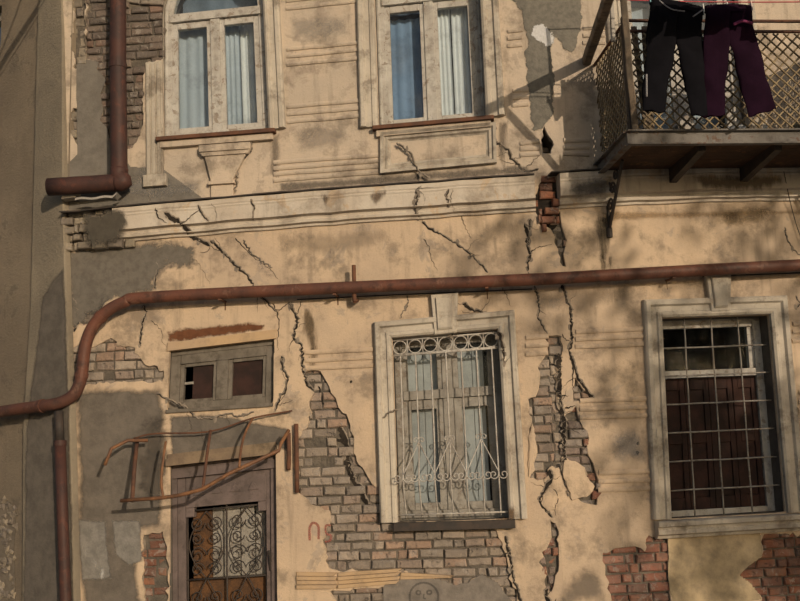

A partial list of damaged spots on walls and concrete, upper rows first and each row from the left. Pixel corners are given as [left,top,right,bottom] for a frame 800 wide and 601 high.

flaking render [126,0,167,149]
crack [396,142,488,273]
crack [492,121,540,172]
spalling [536,175,566,266]
crack [138,174,372,505]
crack [458,289,510,313]
crack [524,218,595,518]
flaking render [528,335,601,505]
flaking render [299,371,517,601]
crack [501,536,523,601]
flaking render [602,535,670,601]
flaking render [740,533,800,601]